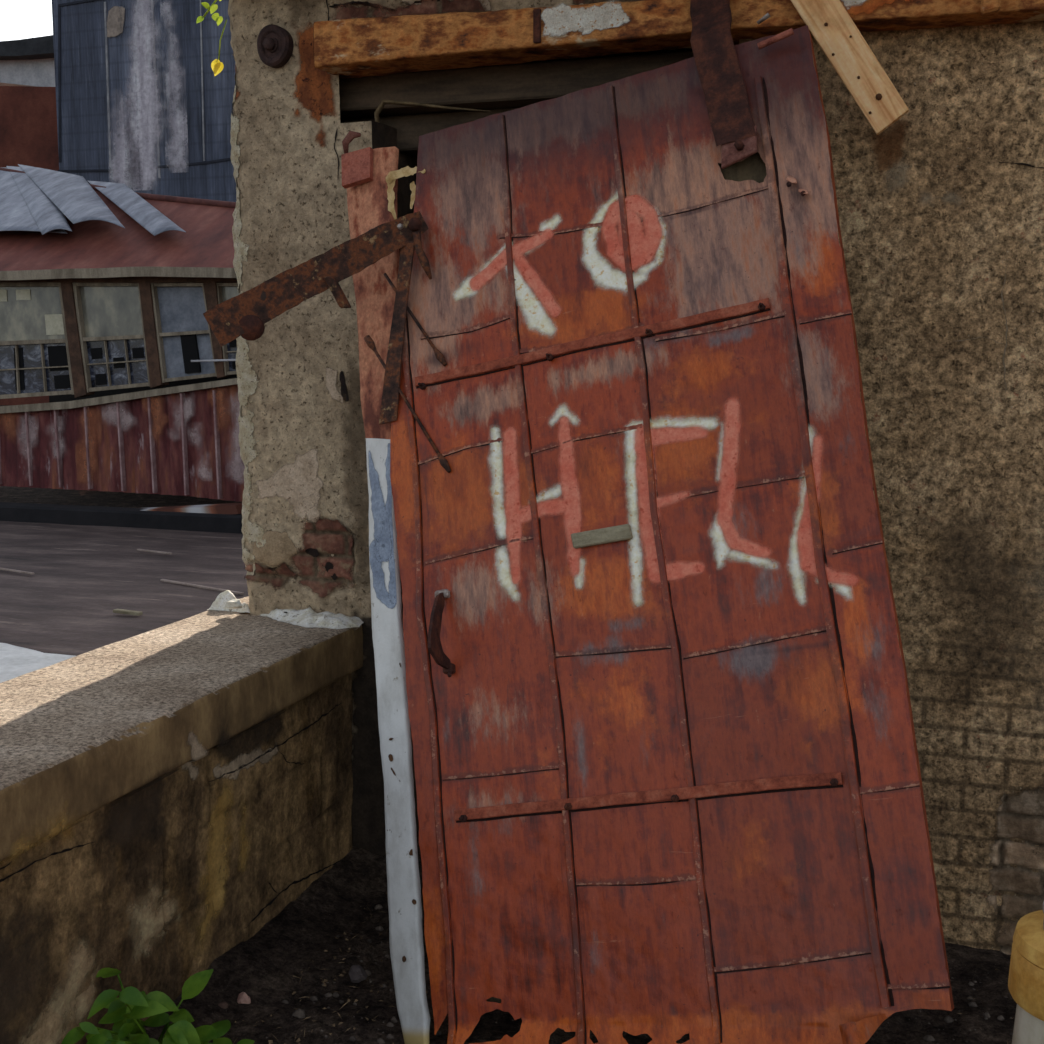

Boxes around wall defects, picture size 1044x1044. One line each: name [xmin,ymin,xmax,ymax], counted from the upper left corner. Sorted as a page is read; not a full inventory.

crack [326,0,440,21]
peeling [541,0,643,36]
leakage [112,0,188,190]
peeling [230,55,249,295]
rust [874,123,904,169]
spalling [235,336,354,598]
crack [0,842,94,882]
leakage [105,771,173,845]
leakage [200,788,249,939]
spalling [987,784,1044,955]